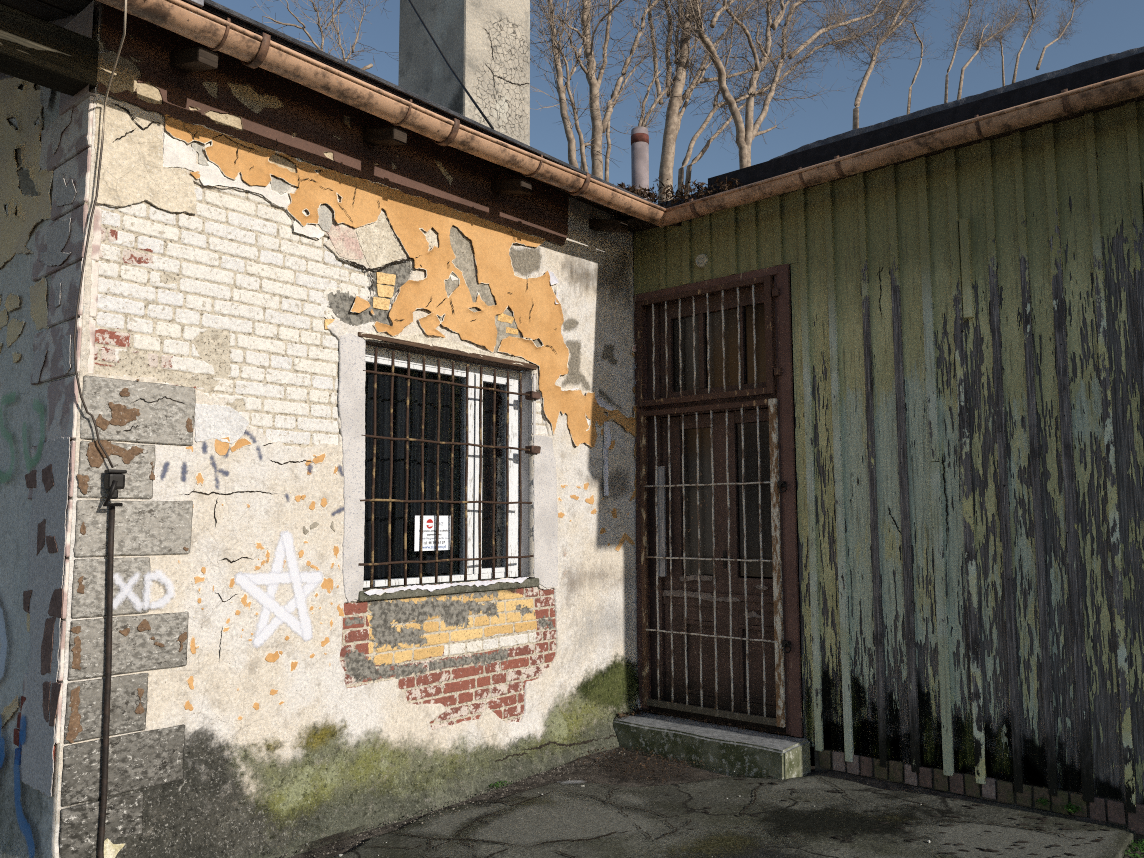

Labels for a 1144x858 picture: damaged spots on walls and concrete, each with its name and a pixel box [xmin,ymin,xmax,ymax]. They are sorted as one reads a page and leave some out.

crack [474,15,530,138]
spalling [0,41,638,797]
peeling [791,101,1144,796]
damp [0,758,47,858]
damp [70,701,638,858]
crack [366,784,692,858]
crack [496,734,617,762]
damp [806,668,1082,794]
damp [1096,779,1123,801]